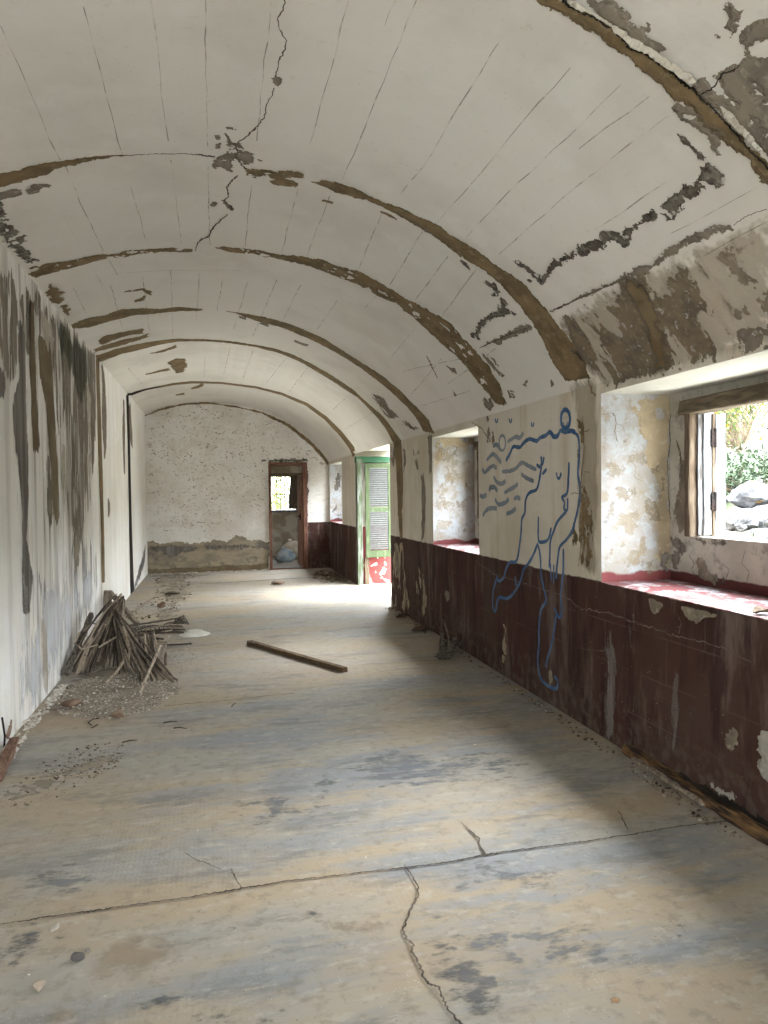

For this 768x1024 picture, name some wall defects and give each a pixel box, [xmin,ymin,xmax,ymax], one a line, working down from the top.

crack [122,0,287,251]
spalling [212,0,768,445]
spalling [0,154,474,616]
water stain [0,301,59,616]
water stain [27,572,92,699]
water stain [134,544,270,590]
peeling [648,598,663,614]
peeling [681,606,717,623]
peeling [725,727,738,751]
spalling [756,730,768,781]
crack [1,811,726,1024]